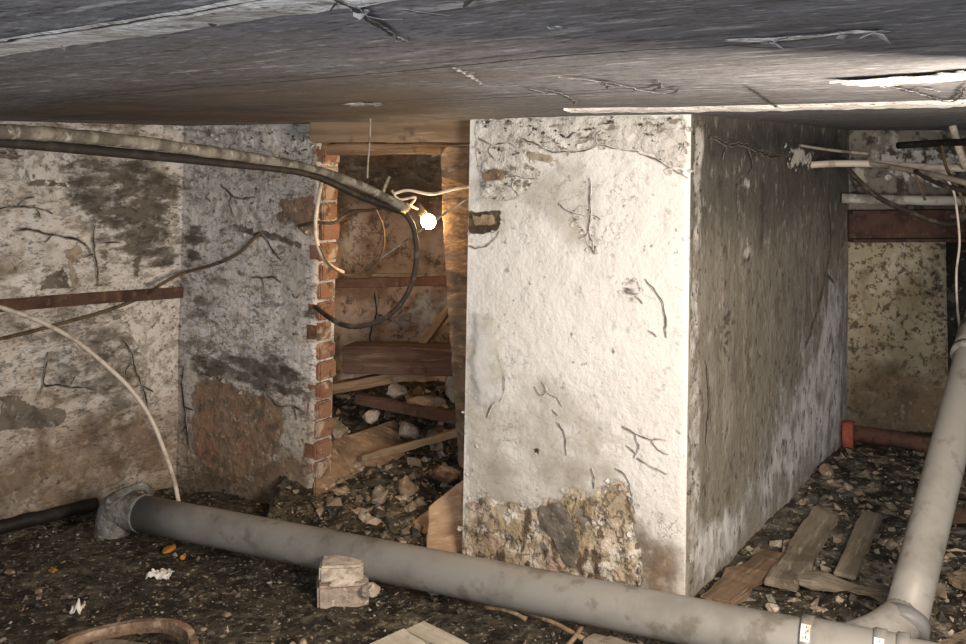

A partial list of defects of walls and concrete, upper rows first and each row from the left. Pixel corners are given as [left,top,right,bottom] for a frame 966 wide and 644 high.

peeling [836,30,891,44]
peeling [121,300,178,407]
peeling [457,115,743,587]
spalling [189,375,284,484]